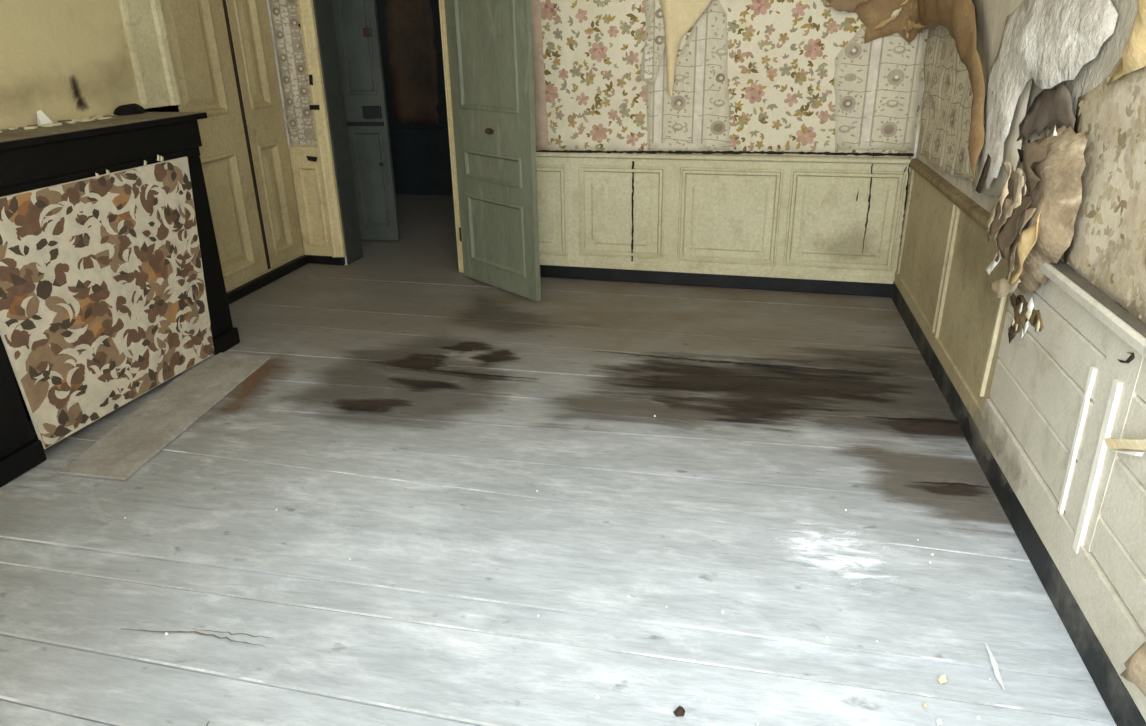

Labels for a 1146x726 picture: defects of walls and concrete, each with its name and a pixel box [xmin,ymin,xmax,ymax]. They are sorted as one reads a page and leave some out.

peeling [972,0,1119,193]
crack [536,150,914,261]
peeling [1008,293,1044,343]
water stain [299,340,518,424]
water stain [555,347,966,438]
water stain [848,448,1011,524]